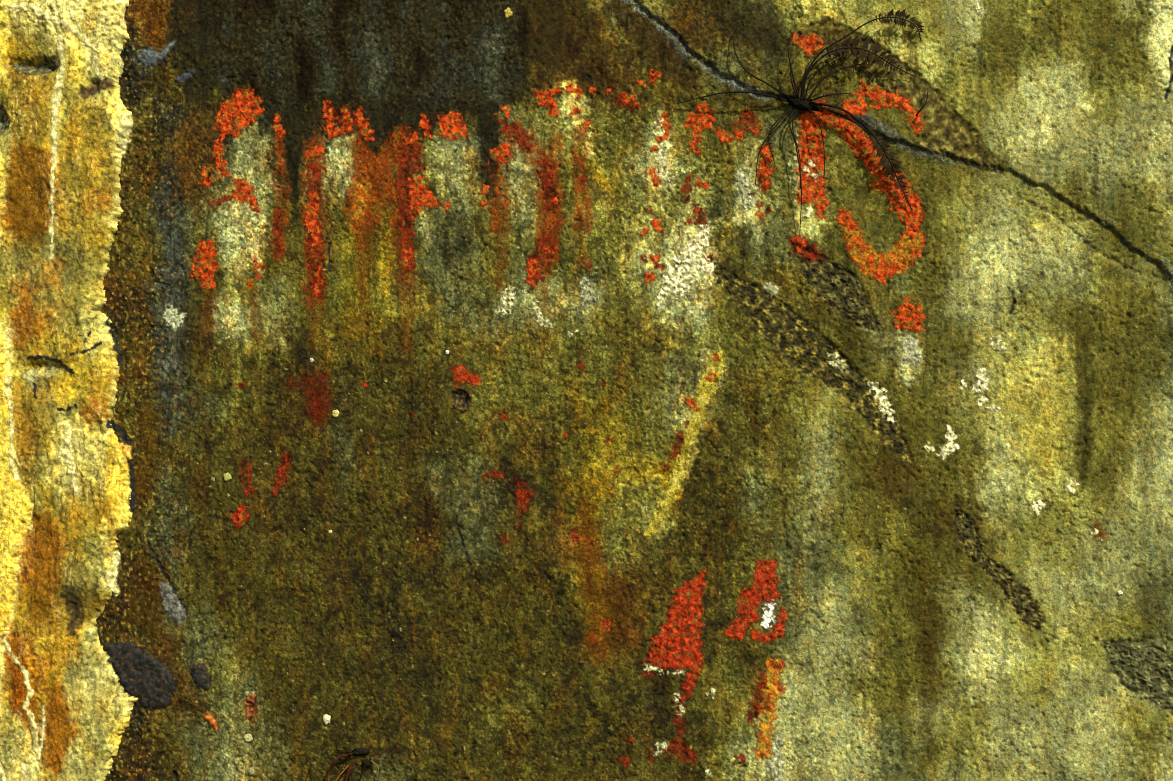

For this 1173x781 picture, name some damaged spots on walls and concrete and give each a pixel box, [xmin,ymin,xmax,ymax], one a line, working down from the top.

leakage [165,0,696,201]
crack [623,0,785,100]
crack [1165,44,1173,99]
crack [852,112,1173,292]